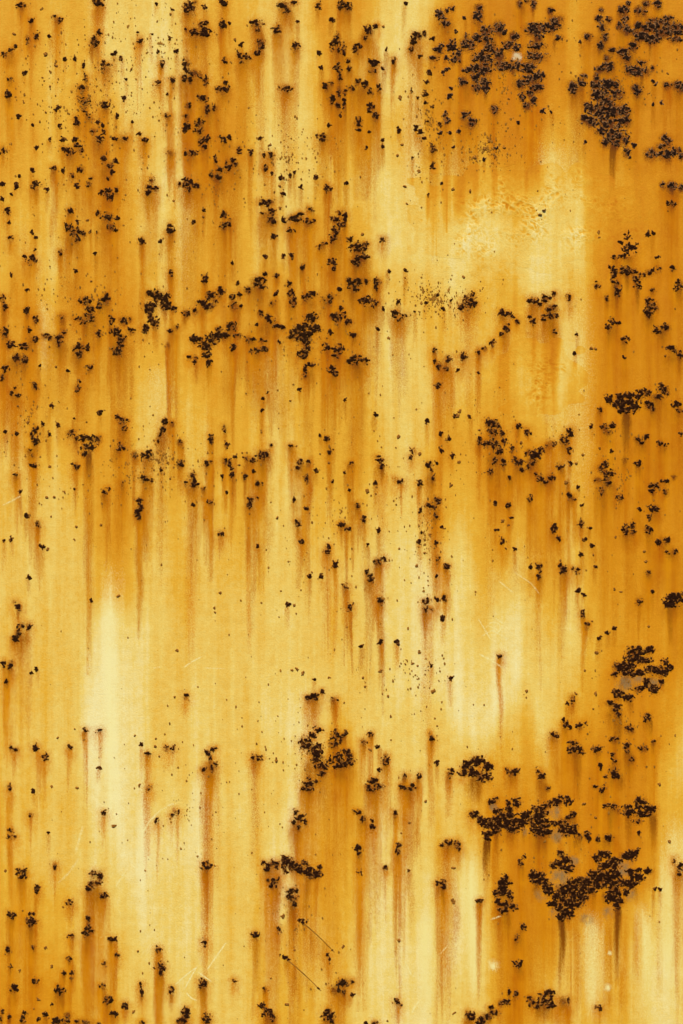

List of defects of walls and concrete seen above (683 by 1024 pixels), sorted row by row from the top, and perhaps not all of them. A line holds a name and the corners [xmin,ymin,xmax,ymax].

rust [0,0,412,675]
rust [244,0,683,1024]